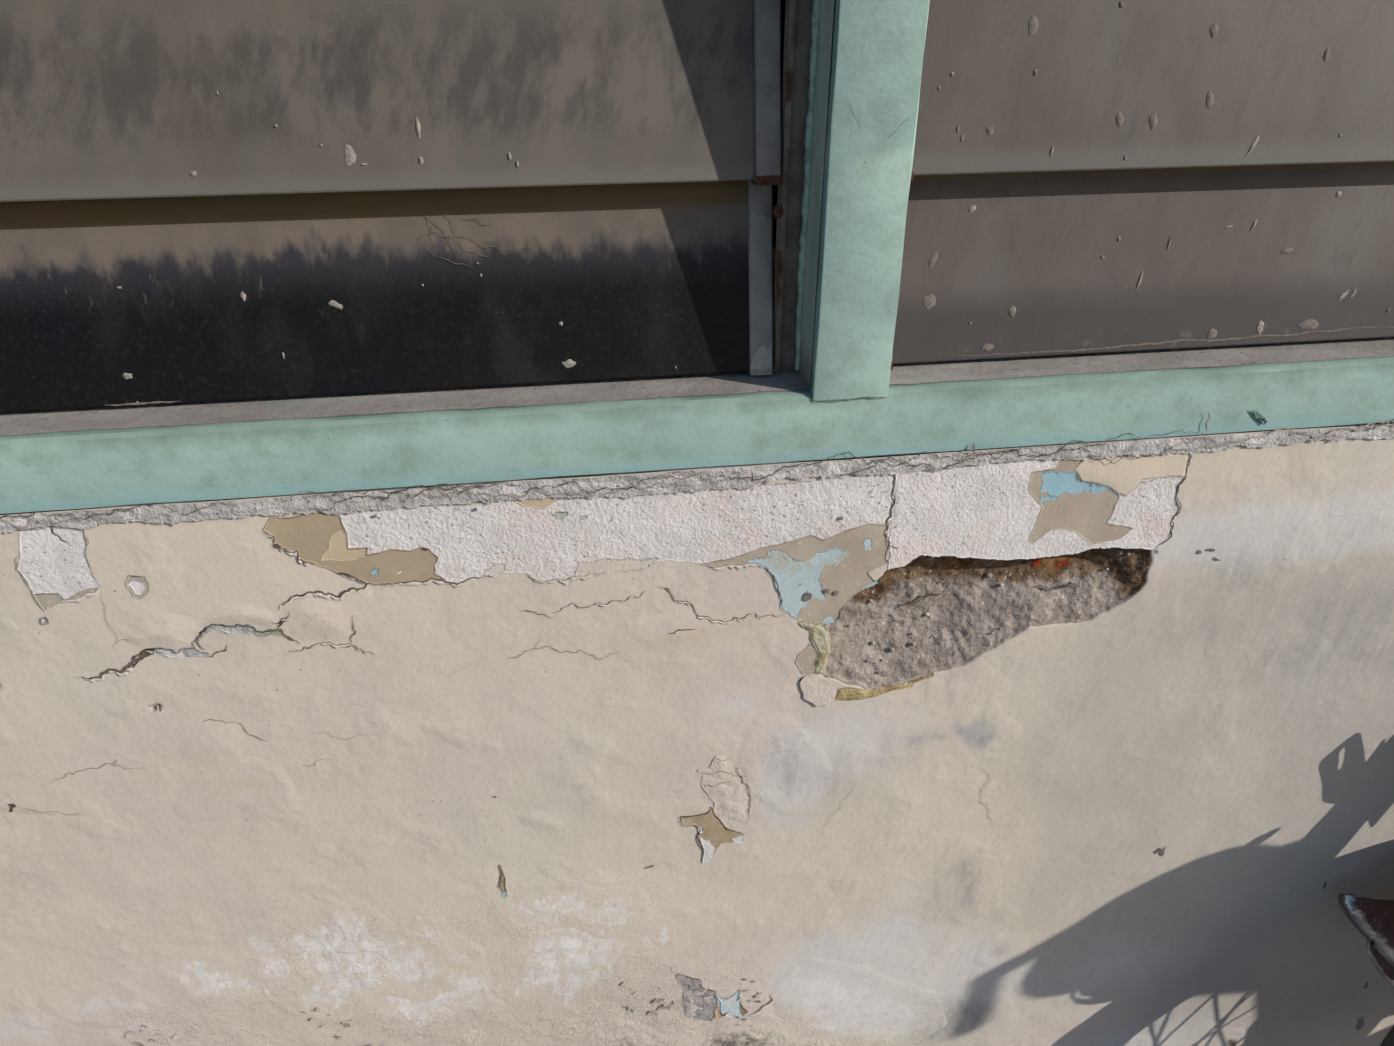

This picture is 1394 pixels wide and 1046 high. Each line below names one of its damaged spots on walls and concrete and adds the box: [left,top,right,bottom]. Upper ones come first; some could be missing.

peeling [15,526,101,625]
crack [69,583,377,683]
crack [499,586,784,660]
peeling [263,453,1189,707]
peeling [679,806,745,863]
water stain [37,878,691,1046]
peeling [621,974,773,1026]
water stain [577,957,1021,1046]